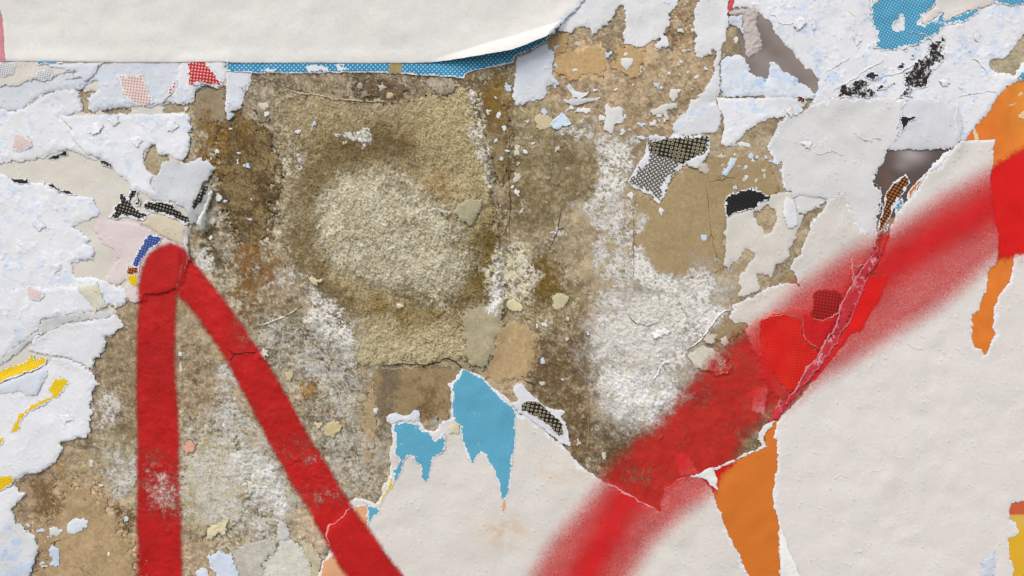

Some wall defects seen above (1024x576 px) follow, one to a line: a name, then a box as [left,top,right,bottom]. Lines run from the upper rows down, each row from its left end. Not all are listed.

peeling [548,32,646,81]
leakage [273,143,305,178]
leakage [334,128,372,149]
leakage [466,87,495,188]
peeling [632,153,780,280]
leakage [539,117,736,464]
crack [382,358,482,376]
peeling [22,470,147,576]
spalling [174,419,251,541]